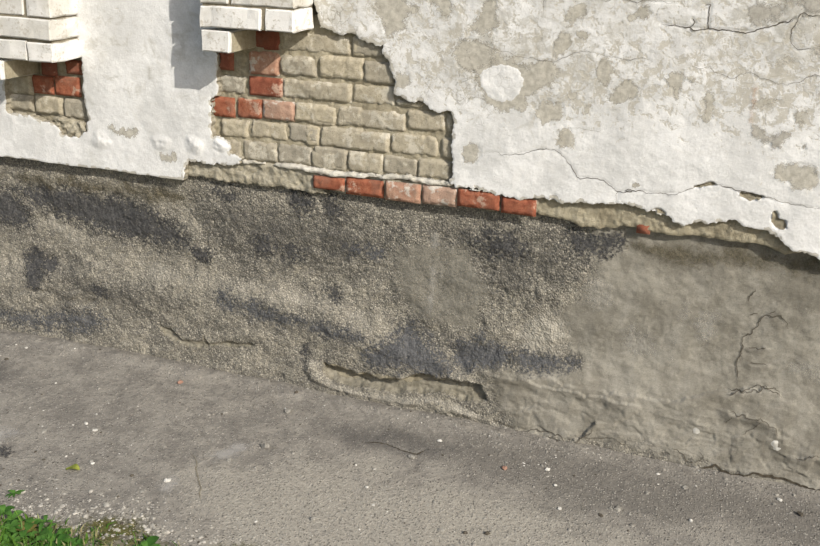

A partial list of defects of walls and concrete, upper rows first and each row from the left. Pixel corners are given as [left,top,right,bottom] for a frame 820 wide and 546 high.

spalling [4,57,89,138]
spalling [187,0,800,255]
peeling [160,151,177,162]
peeling [772,163,819,190]
water stain [0,175,215,265]
water stain [286,189,342,221]
water stain [23,244,60,292]
water stain [0,305,109,336]
water stain [212,284,582,379]
crack [726,290,788,435]
crack [489,420,625,445]
crack [674,449,820,491]